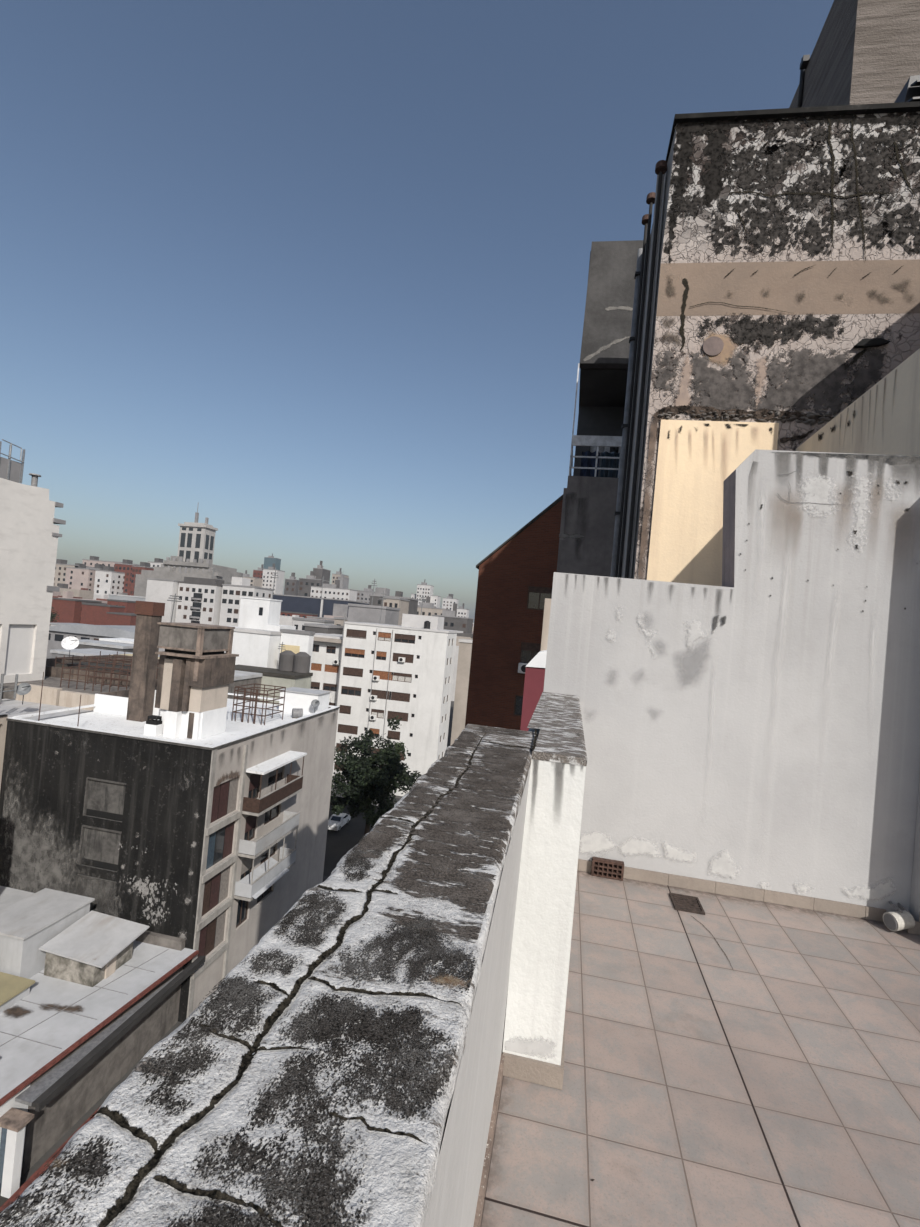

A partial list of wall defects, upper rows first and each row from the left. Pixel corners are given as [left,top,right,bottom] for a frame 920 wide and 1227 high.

spalling [717,198,731,213]
crack [679,268,789,351]
flaking render [655,328,891,442]
damp [638,417,662,577]
damp [777,452,920,480]
damp [4,1004,82,1018]
crack [90,729,538,1227]